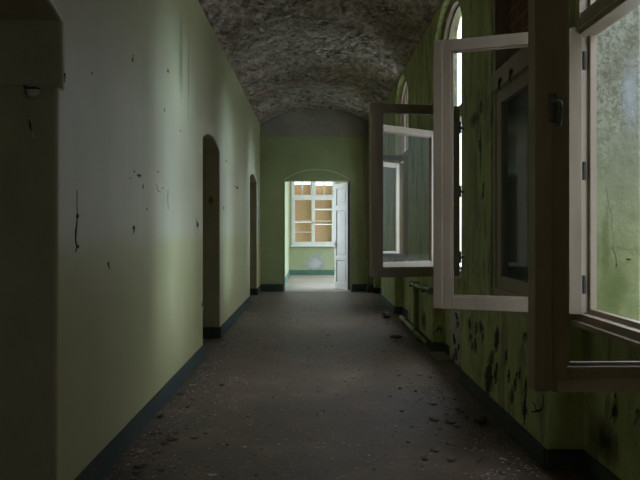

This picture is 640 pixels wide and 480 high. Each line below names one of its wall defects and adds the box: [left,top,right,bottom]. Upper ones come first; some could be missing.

crack [73,196,81,252]
flaking render [307,256,322,269]